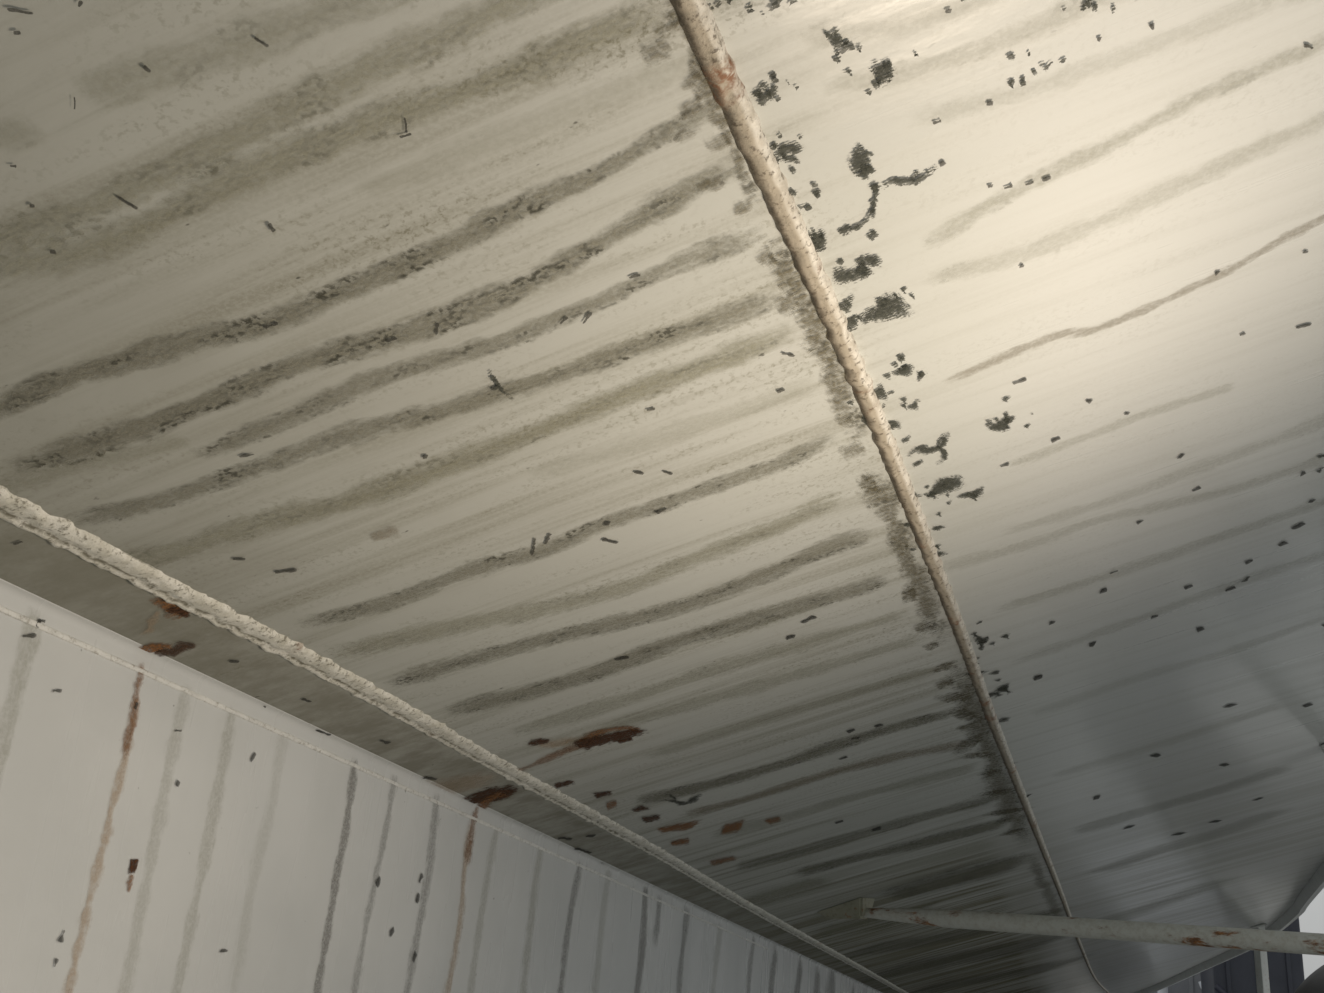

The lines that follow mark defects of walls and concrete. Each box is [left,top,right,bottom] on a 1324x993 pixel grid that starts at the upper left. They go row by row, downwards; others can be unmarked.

corrosion [153,598,189,619]
corrosion [140,641,195,657]
corrosion [124,667,143,750]
corrosion [519,726,644,771]
corrosion [593,791,617,809]
corrosion [464,785,517,861]
corrosion [632,806,697,846]
corrosion [722,820,743,835]
corrosion [127,859,139,891]
leakage [315,767,356,993]